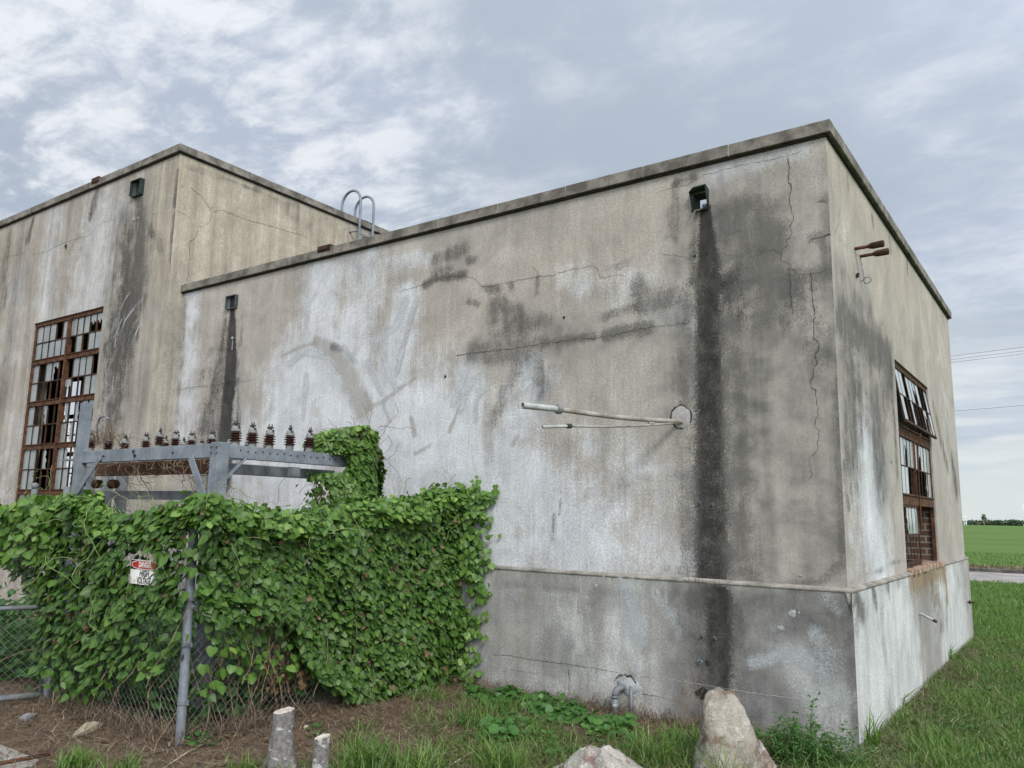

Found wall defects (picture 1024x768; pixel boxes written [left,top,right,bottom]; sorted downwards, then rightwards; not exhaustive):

water stain [102,195,155,436]
water stain [201,308,239,444]
water stain [287,245,475,417]
water stain [449,193,834,718]
crack [659,151,857,479]
water stain [831,364,898,571]
water stain [854,587,877,620]